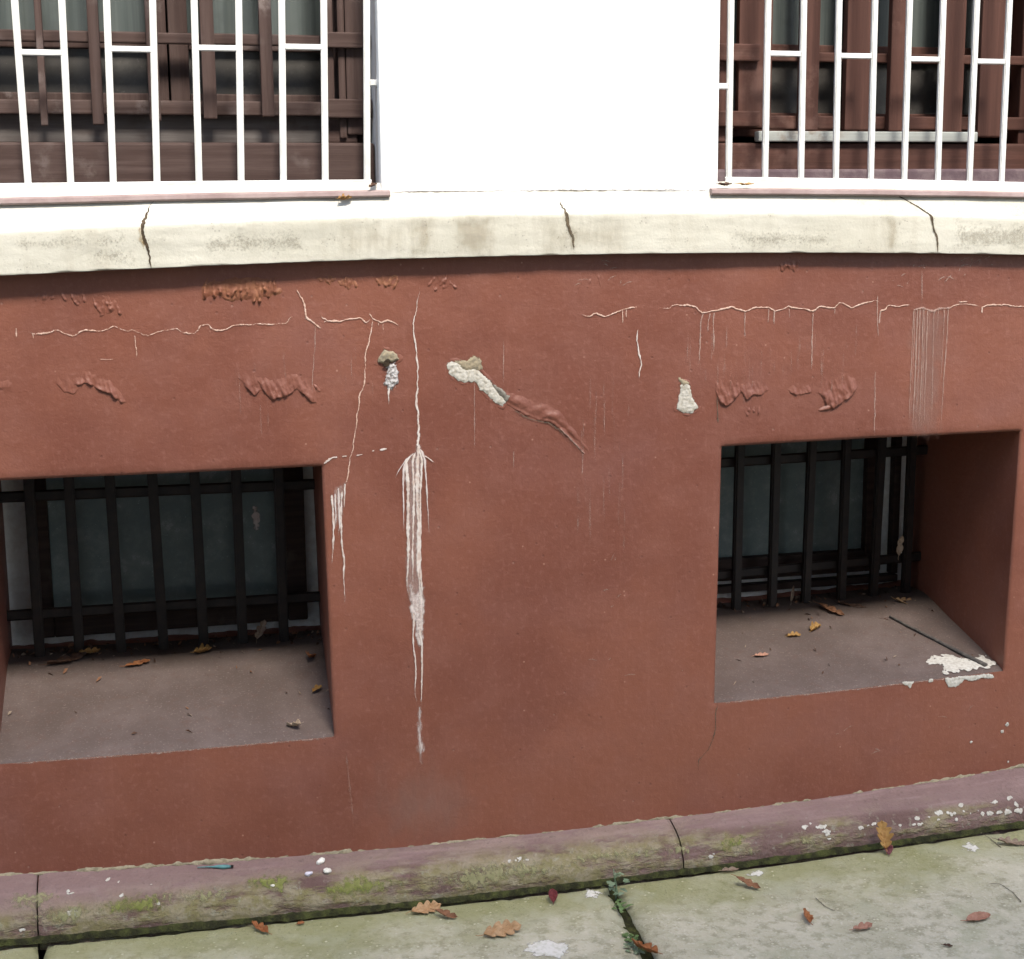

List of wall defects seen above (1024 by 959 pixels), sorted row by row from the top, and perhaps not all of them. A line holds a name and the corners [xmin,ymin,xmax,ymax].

crack [141,202,153,266]
crack [402,189,706,249]
crack [900,197,939,250]
crack [16,290,420,482]
crack [665,297,905,362]
damp [909,307,949,413]
crack [950,301,1024,312]
damp [398,444,433,700]
peeling [894,654,996,688]